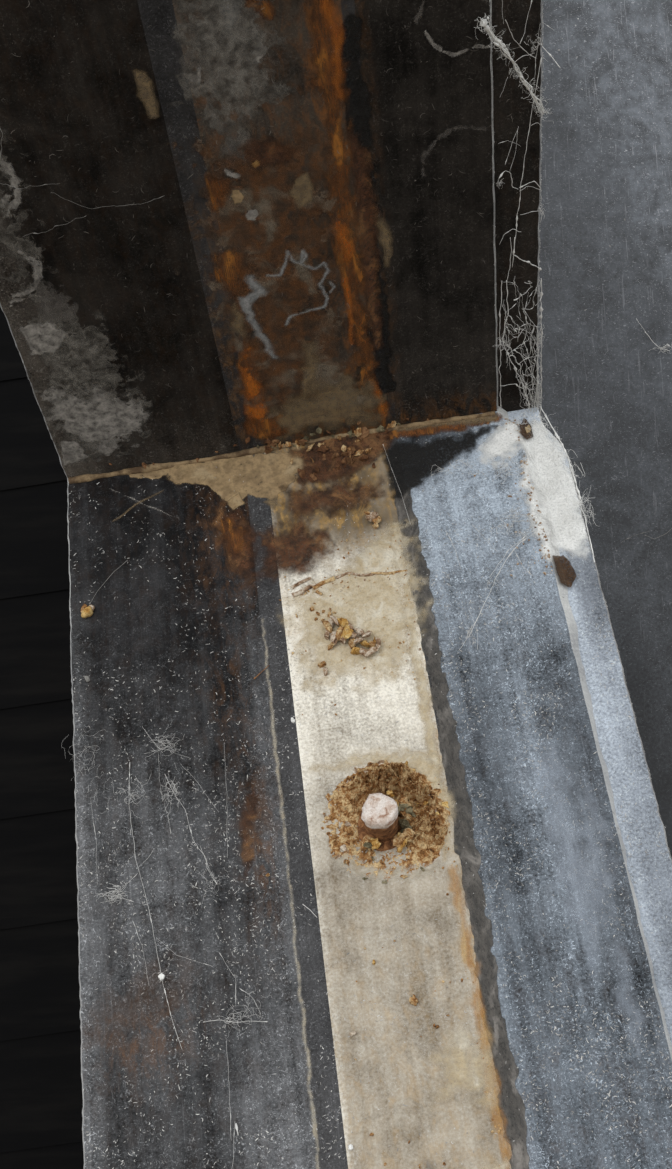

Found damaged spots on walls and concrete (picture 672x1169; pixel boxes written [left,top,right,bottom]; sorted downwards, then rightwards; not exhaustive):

water stain [0,155,151,465]
rust [174,0,502,584]
peeling [129,447,304,509]